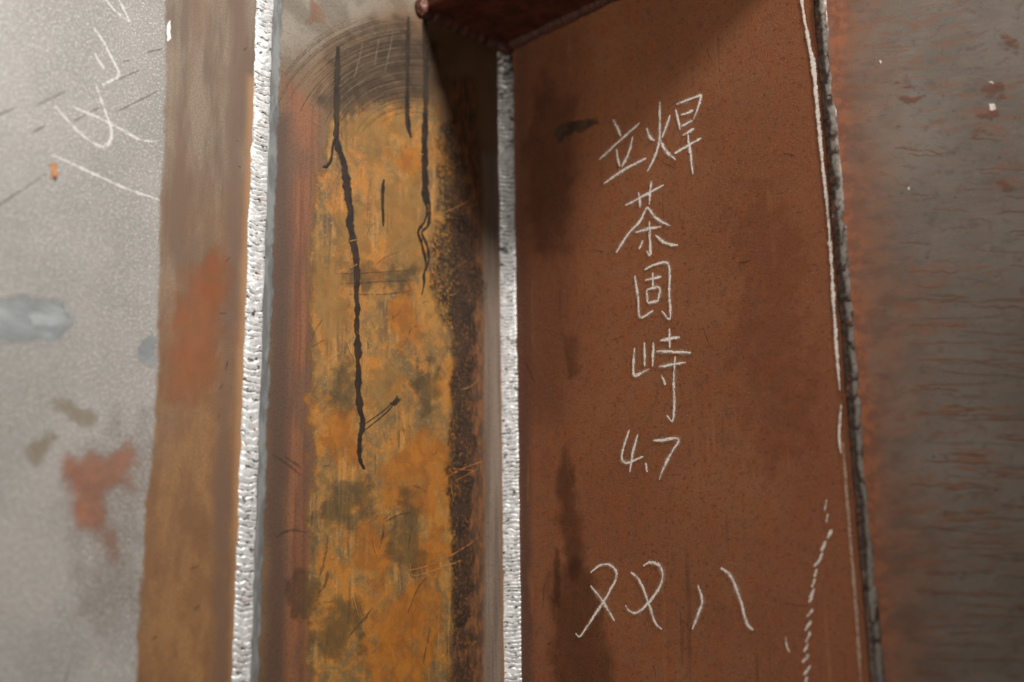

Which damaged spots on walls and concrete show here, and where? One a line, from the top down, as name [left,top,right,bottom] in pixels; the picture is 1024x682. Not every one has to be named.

corrosion [65,449,134,527]
corrosion [304,90,459,682]